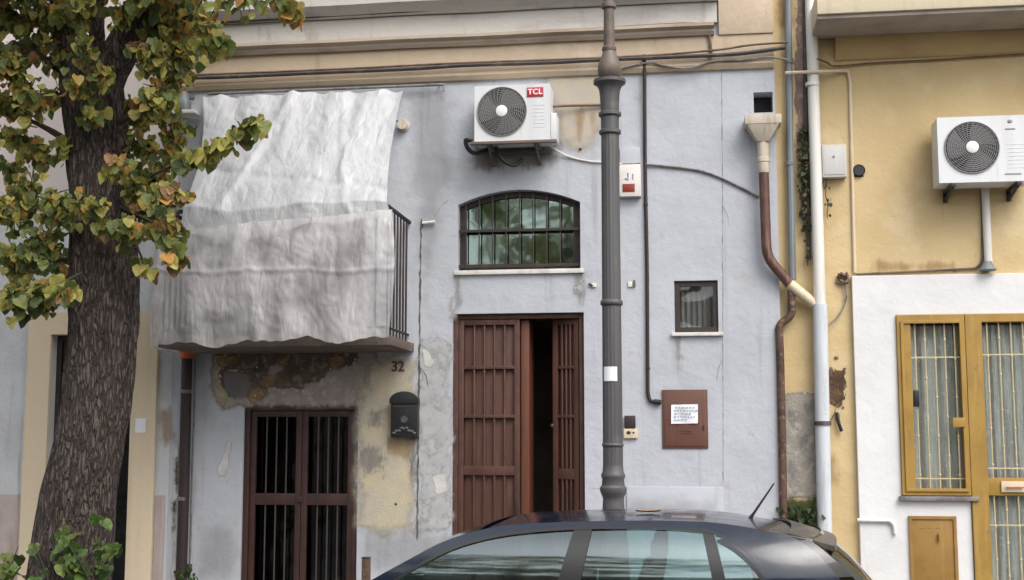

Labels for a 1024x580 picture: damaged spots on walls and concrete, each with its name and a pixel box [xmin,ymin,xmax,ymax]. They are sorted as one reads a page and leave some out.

damp [546,76,601,150]
spalling [210,352,379,410]
spalling [829,367,848,409]
peeling [414,335,454,532]